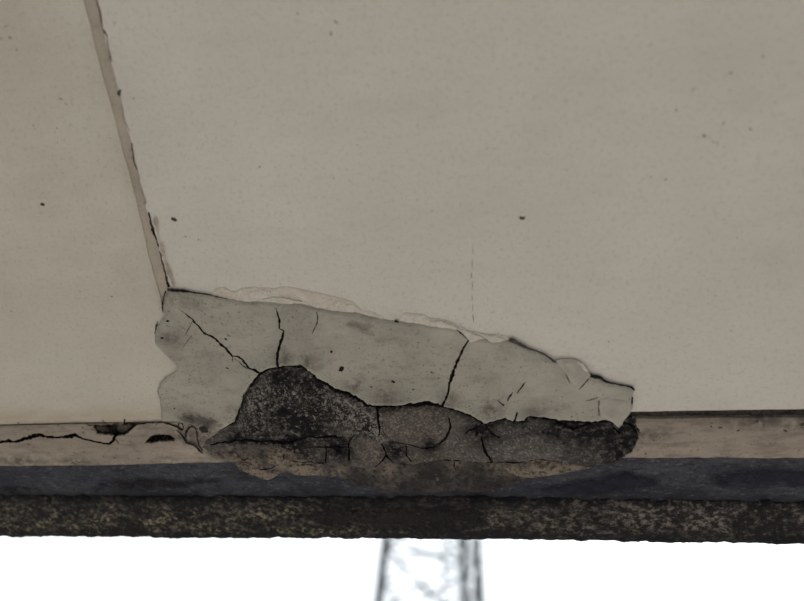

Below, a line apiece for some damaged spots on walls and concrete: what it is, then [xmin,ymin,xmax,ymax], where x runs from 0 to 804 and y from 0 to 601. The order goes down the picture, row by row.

crack [97,0,111,58]
crack [0,98,639,470]
peeling [155,286,640,493]